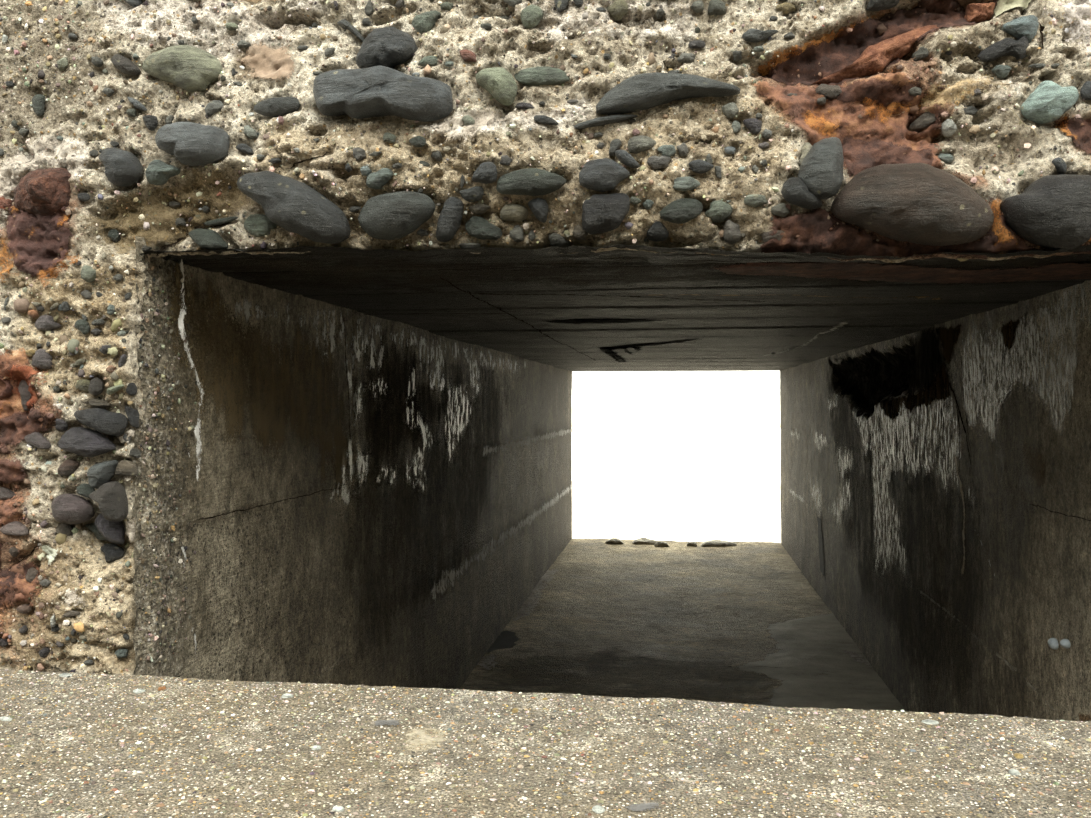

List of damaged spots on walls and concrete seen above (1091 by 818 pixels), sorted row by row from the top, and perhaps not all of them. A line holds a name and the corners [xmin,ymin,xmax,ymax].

corrosion [964,2,995,23]
crack [1021,0,1045,48]
corrosion [752,10,990,177]
corrosion [1054,114,1091,154]
corrosion [0,196,79,286]
crack [440,277,757,359]
corrosion [0,348,63,527]
damp [150,259,526,506]
damp [792,433,850,525]
spalling [831,327,942,417]
damp [853,280,1091,575]
damp [430,481,576,600]